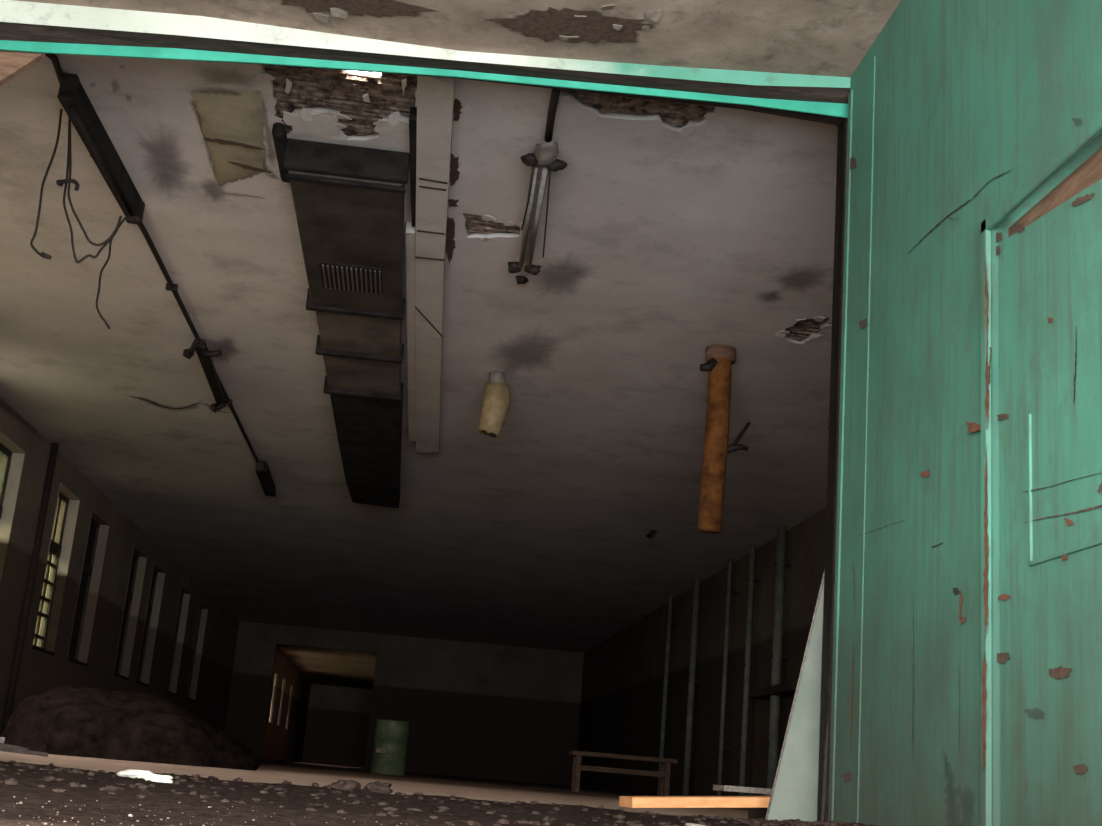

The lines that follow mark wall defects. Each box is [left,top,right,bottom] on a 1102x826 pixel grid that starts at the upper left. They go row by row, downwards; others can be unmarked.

flaking render [254,65,417,140]
flaking render [547,89,718,140]
flaking render [450,153,469,186]
flaking render [446,199,524,263]
crack [908,170,1011,253]
flaking render [774,316,832,344]
corrosion [967,262,991,433]
corrosion [953,587,966,625]